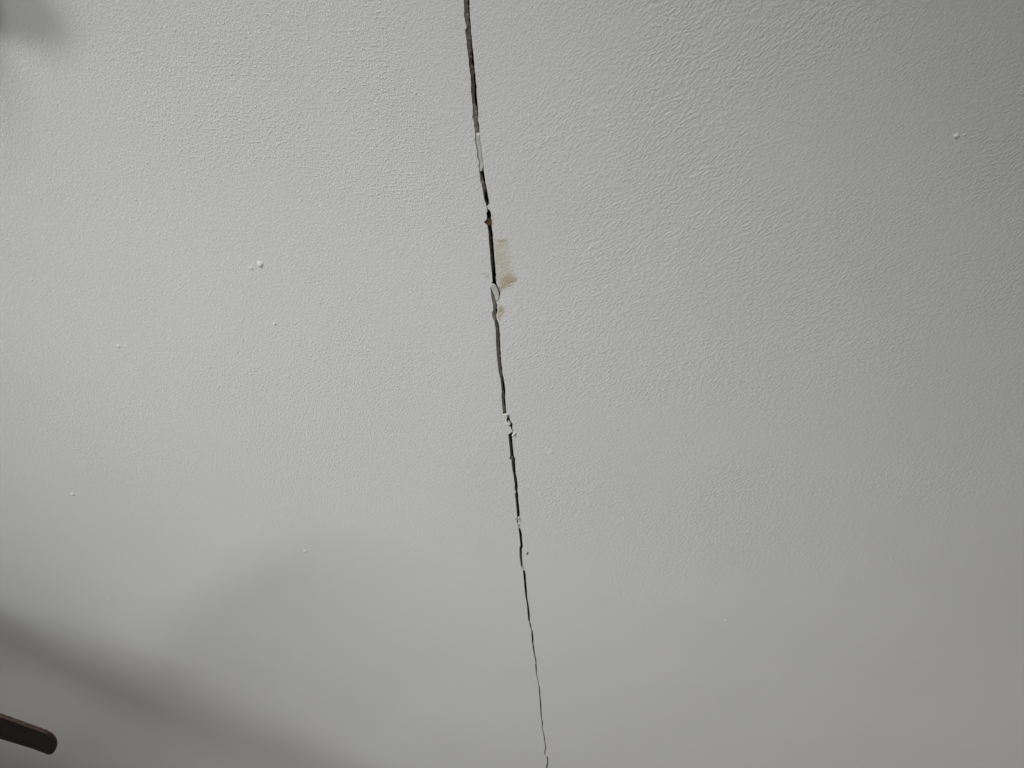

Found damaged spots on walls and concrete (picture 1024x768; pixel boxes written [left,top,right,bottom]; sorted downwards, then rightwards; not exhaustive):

crack [464,0,548,768]